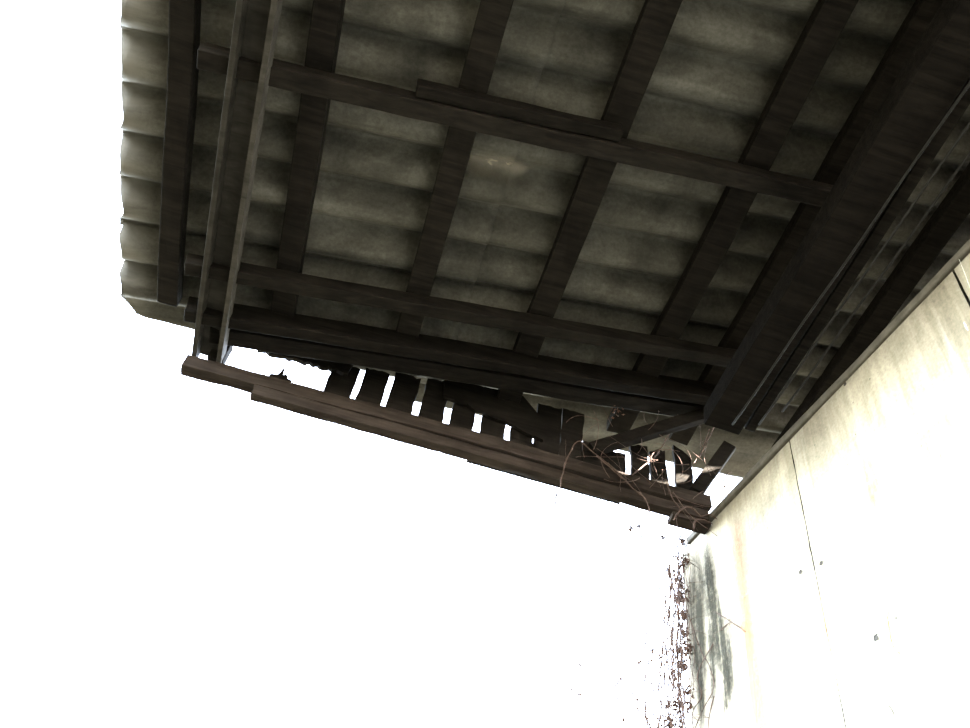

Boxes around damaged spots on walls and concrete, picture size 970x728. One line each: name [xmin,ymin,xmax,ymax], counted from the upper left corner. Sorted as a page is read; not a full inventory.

damp [688,552,733,721]